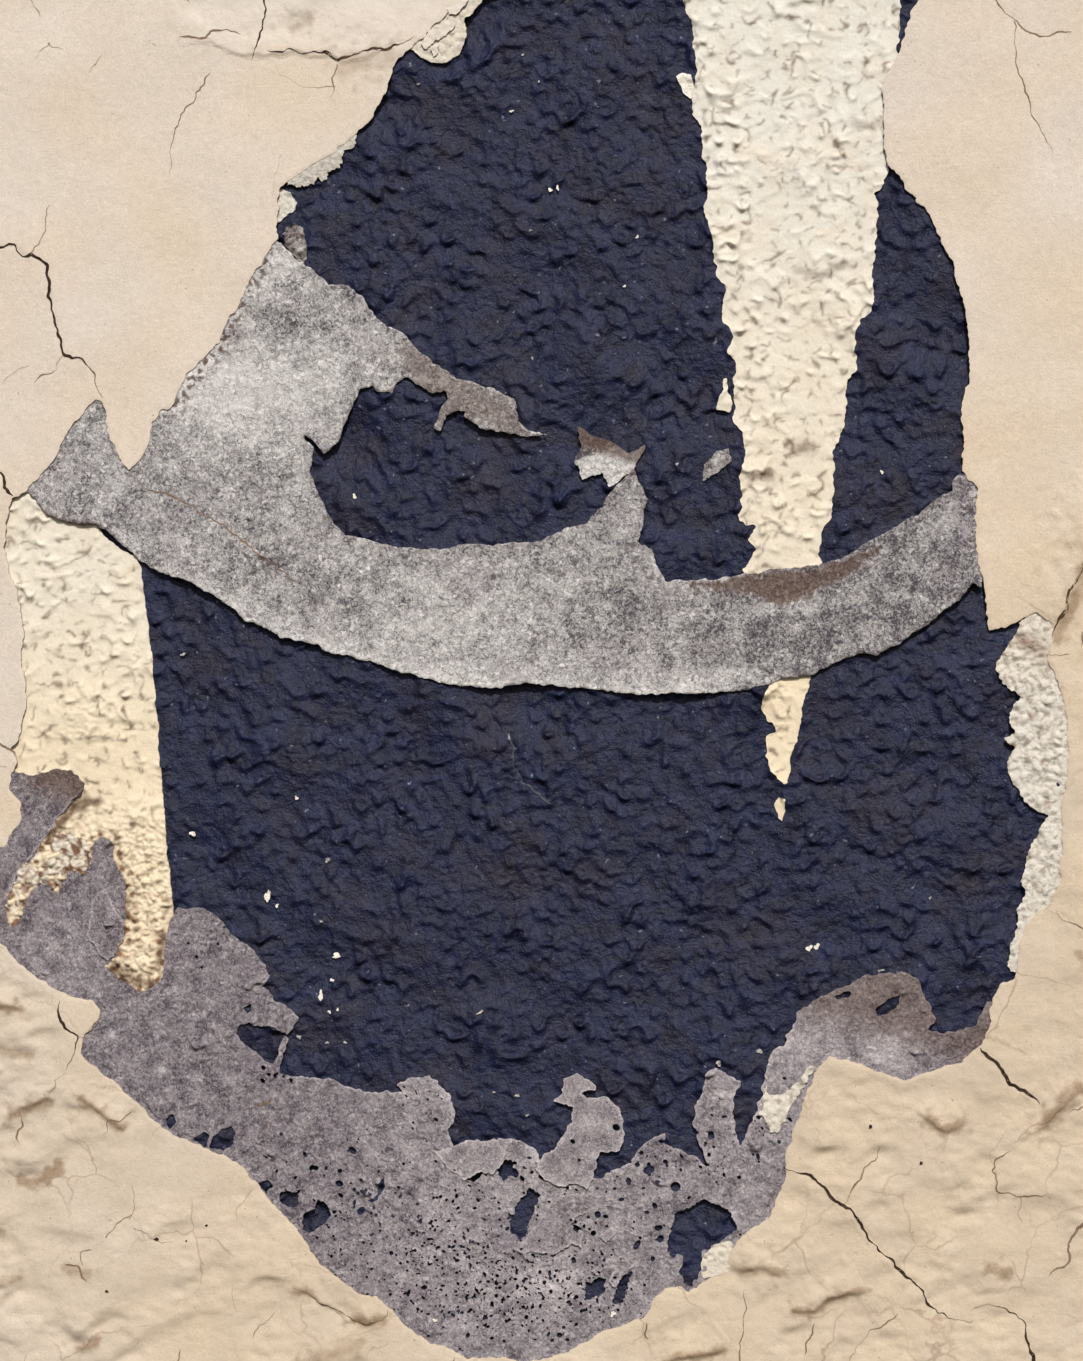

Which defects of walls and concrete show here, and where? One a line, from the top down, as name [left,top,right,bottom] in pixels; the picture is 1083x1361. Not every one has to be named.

crack [169,0,414,171]
crack [996,0,1070,152]
crack [0,205,102,396]
crack [0,472,13,496]
crack [1048,564,1083,655]
peeling [6,877,35,926]
spalling [13,832,91,899]
crack [980,1048,1083,1223]
peeling [582,1277,606,1304]
peeling [612,1271,633,1306]
crack [782,1148,1036,1361]
crack [1050,1223,1083,1274]